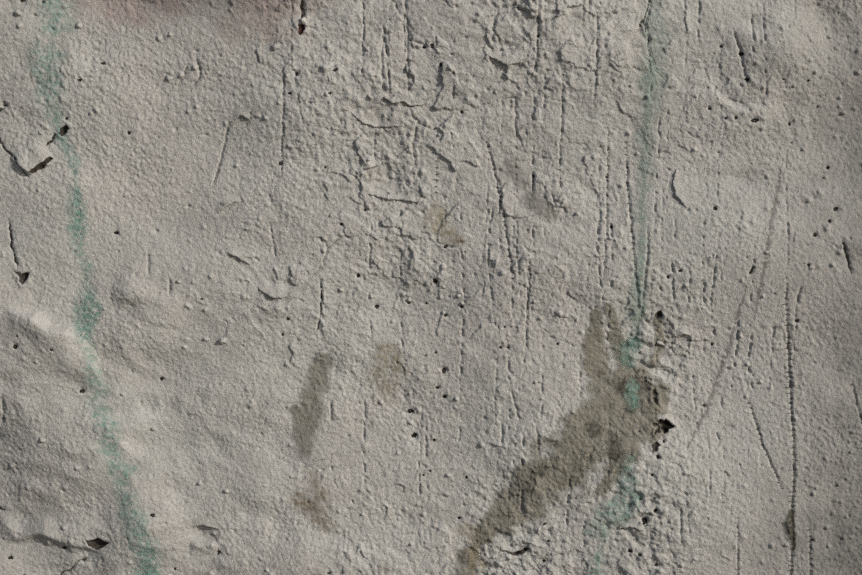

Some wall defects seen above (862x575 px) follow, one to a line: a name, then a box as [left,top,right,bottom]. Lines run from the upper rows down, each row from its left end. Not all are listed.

spalling [29,157,54,173]
leakage [291,355,329,454]
leakage [457,304,669,575]
spalling [652,389,675,451]
spalling [86,538,109,549]